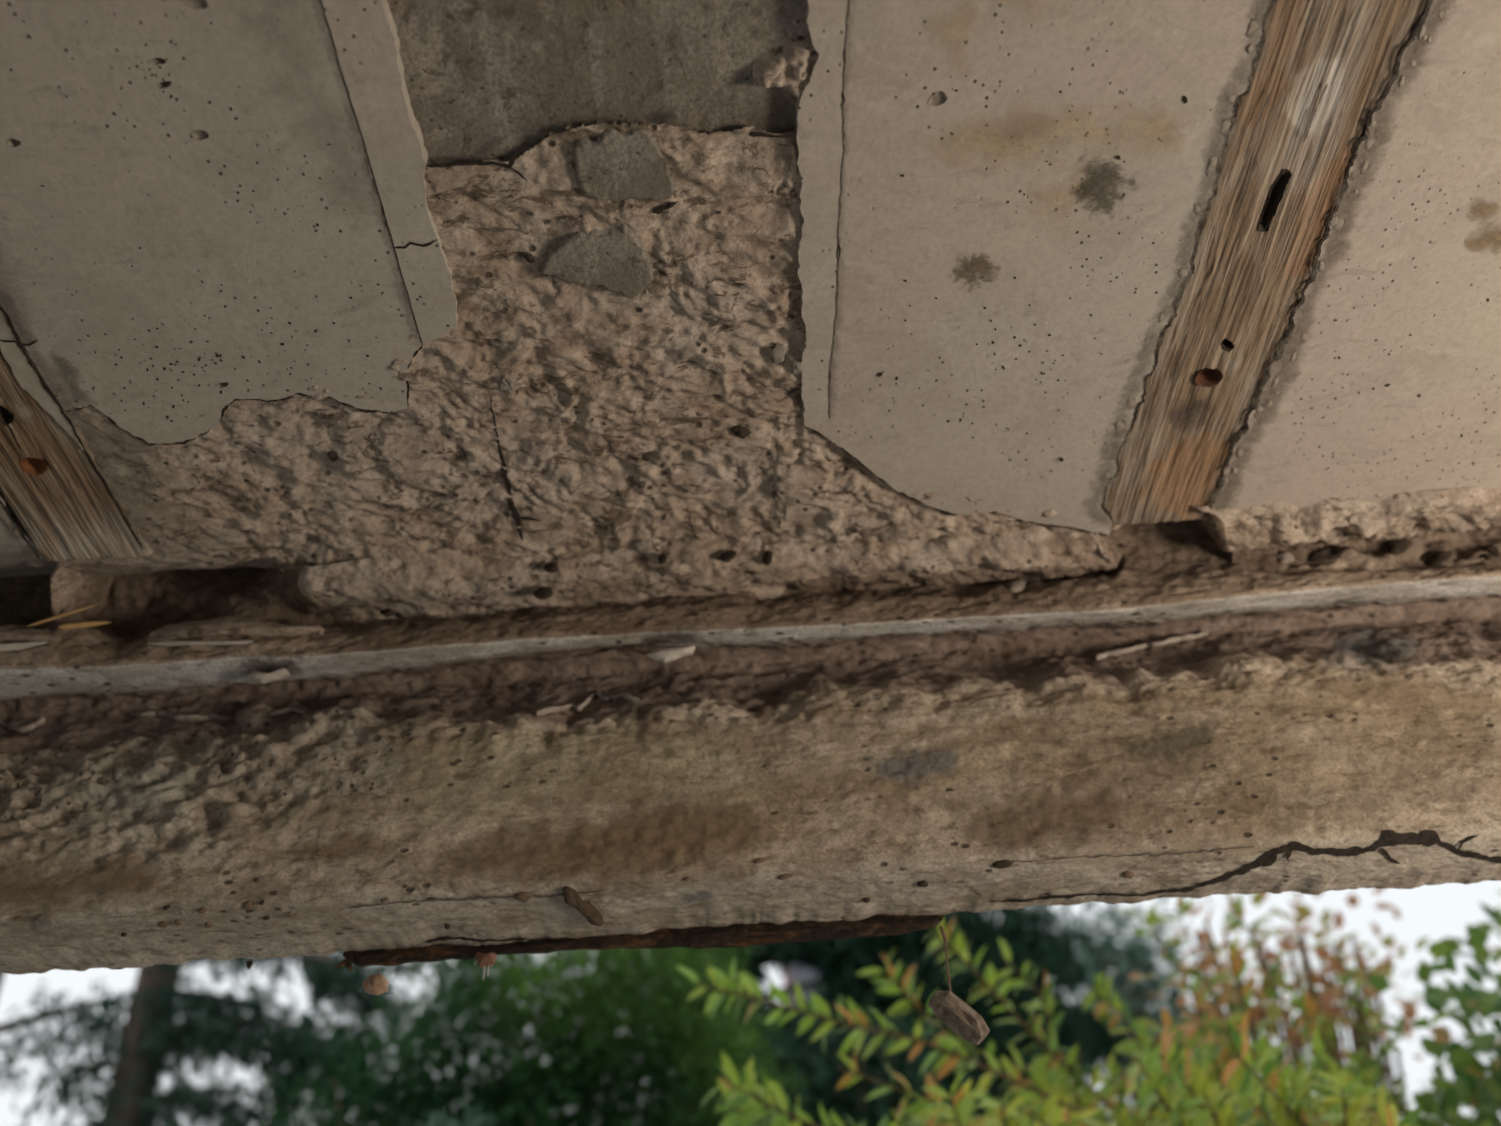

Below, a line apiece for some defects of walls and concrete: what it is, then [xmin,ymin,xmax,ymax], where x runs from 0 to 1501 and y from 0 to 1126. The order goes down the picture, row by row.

spalling [184,0,208,9]
spalling [151,58,171,89]
spalling [928,91,947,106]
water stain [1075,159,1135,213]
crack [478,226,525,234]
crack [0,0,437,551]
water stain [954,255,997,287]
spalling [58,121,1074,576]
crack [490,395,542,541]
crack [990,829,1501,902]